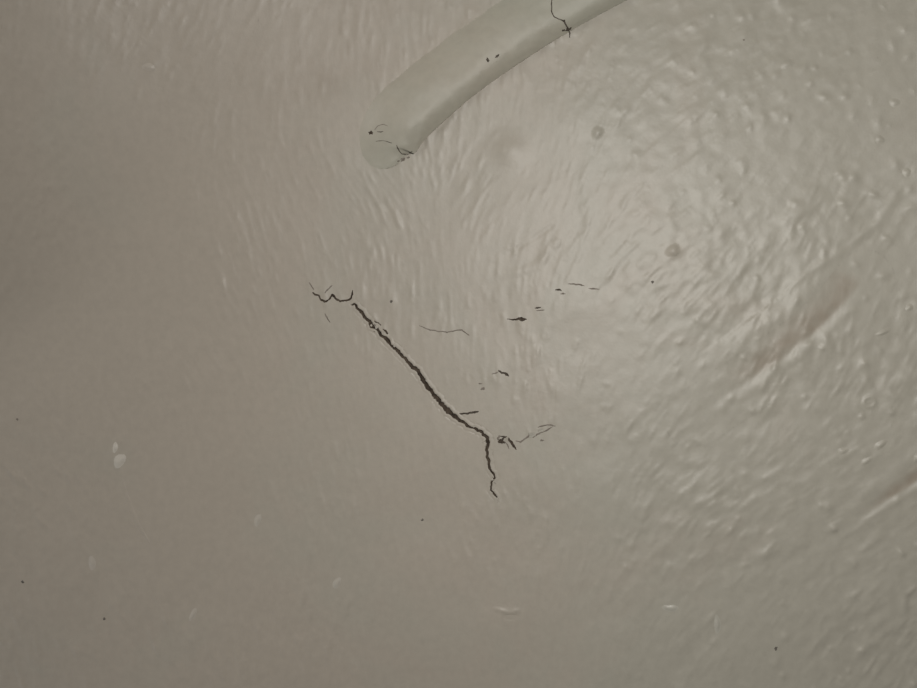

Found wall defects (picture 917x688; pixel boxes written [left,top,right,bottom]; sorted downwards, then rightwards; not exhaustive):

crack [309,282,509,503]
crack [509,307,543,321]